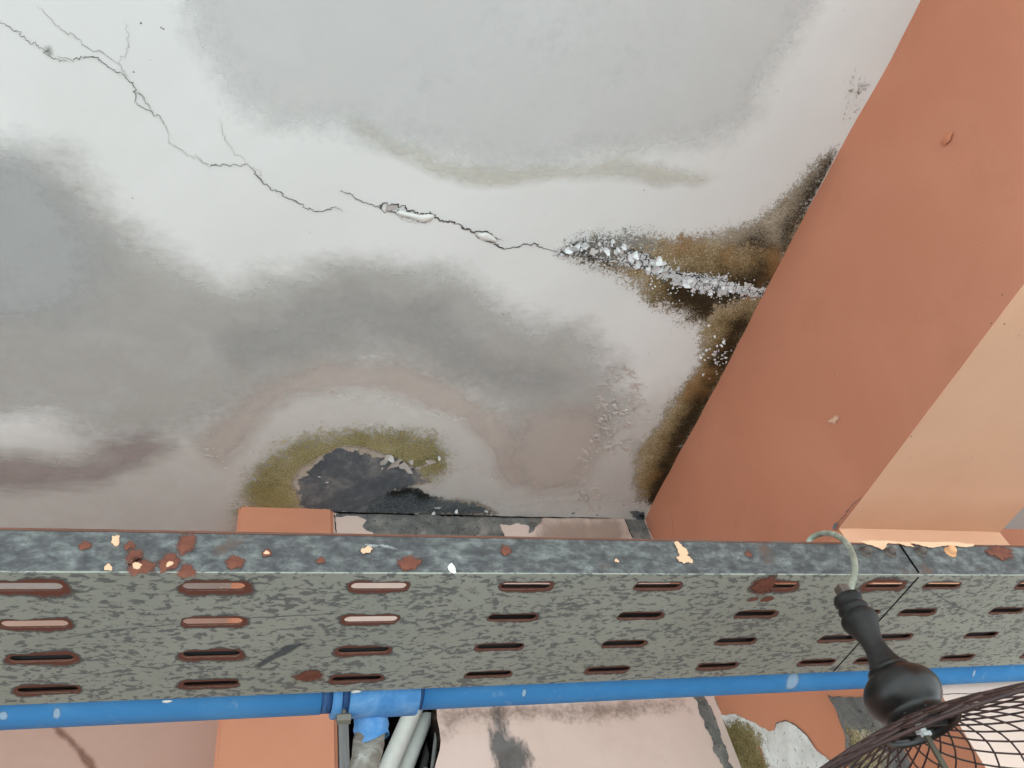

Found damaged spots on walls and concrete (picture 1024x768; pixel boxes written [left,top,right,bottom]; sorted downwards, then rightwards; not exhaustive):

crack [0,7,558,252]
water stain [557,145,837,520]
spalling [292,446,542,536]
rust [124,532,257,598]
rust [345,555,422,595]
rust [733,574,800,619]
rust [984,546,1014,561]
rust [291,670,386,685]
peeling [693,696,829,768]